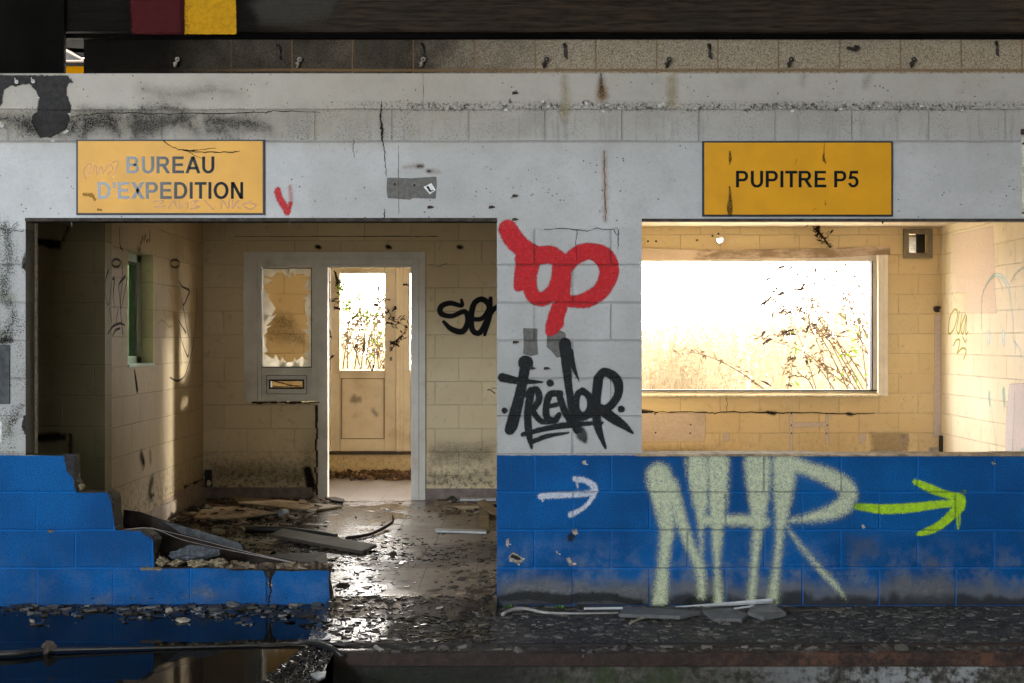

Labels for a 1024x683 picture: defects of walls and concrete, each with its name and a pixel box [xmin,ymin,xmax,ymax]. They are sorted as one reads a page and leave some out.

peeling [0,75,80,143]
water stain [79,105,265,139]
crack [234,101,438,237]
crack [642,398,874,416]
water stain [303,466,315,497]
spalling [506,538,525,565]
crack [264,570,275,604]